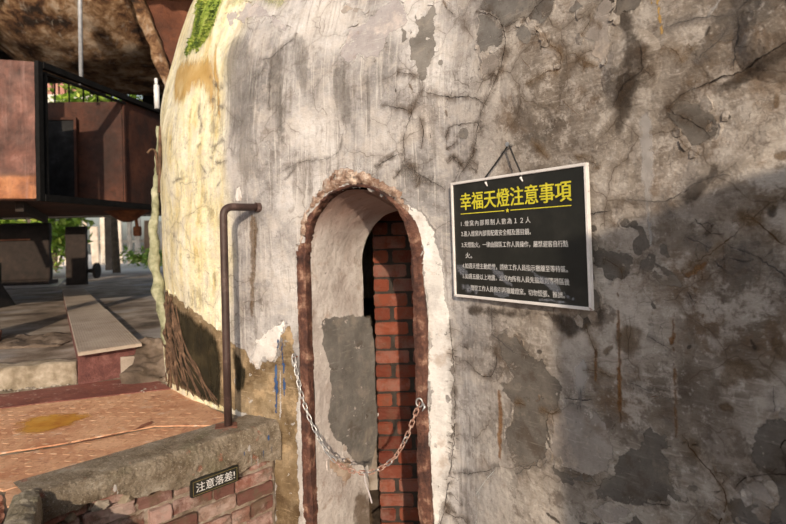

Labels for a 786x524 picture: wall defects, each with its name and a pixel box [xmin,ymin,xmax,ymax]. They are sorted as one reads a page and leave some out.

flaking render [338,0,446,81]
crack [376,0,543,188]
crack [528,35,594,83]
leakage [608,0,647,129]
crack [614,43,651,104]
crack [665,0,786,134]
leakage [166,308,220,405]
peeling [164,288,301,524]
leakage [233,352,245,391]
flaking render [295,165,458,524]
peeling [493,326,704,524]
corrosion [594,310,641,422]